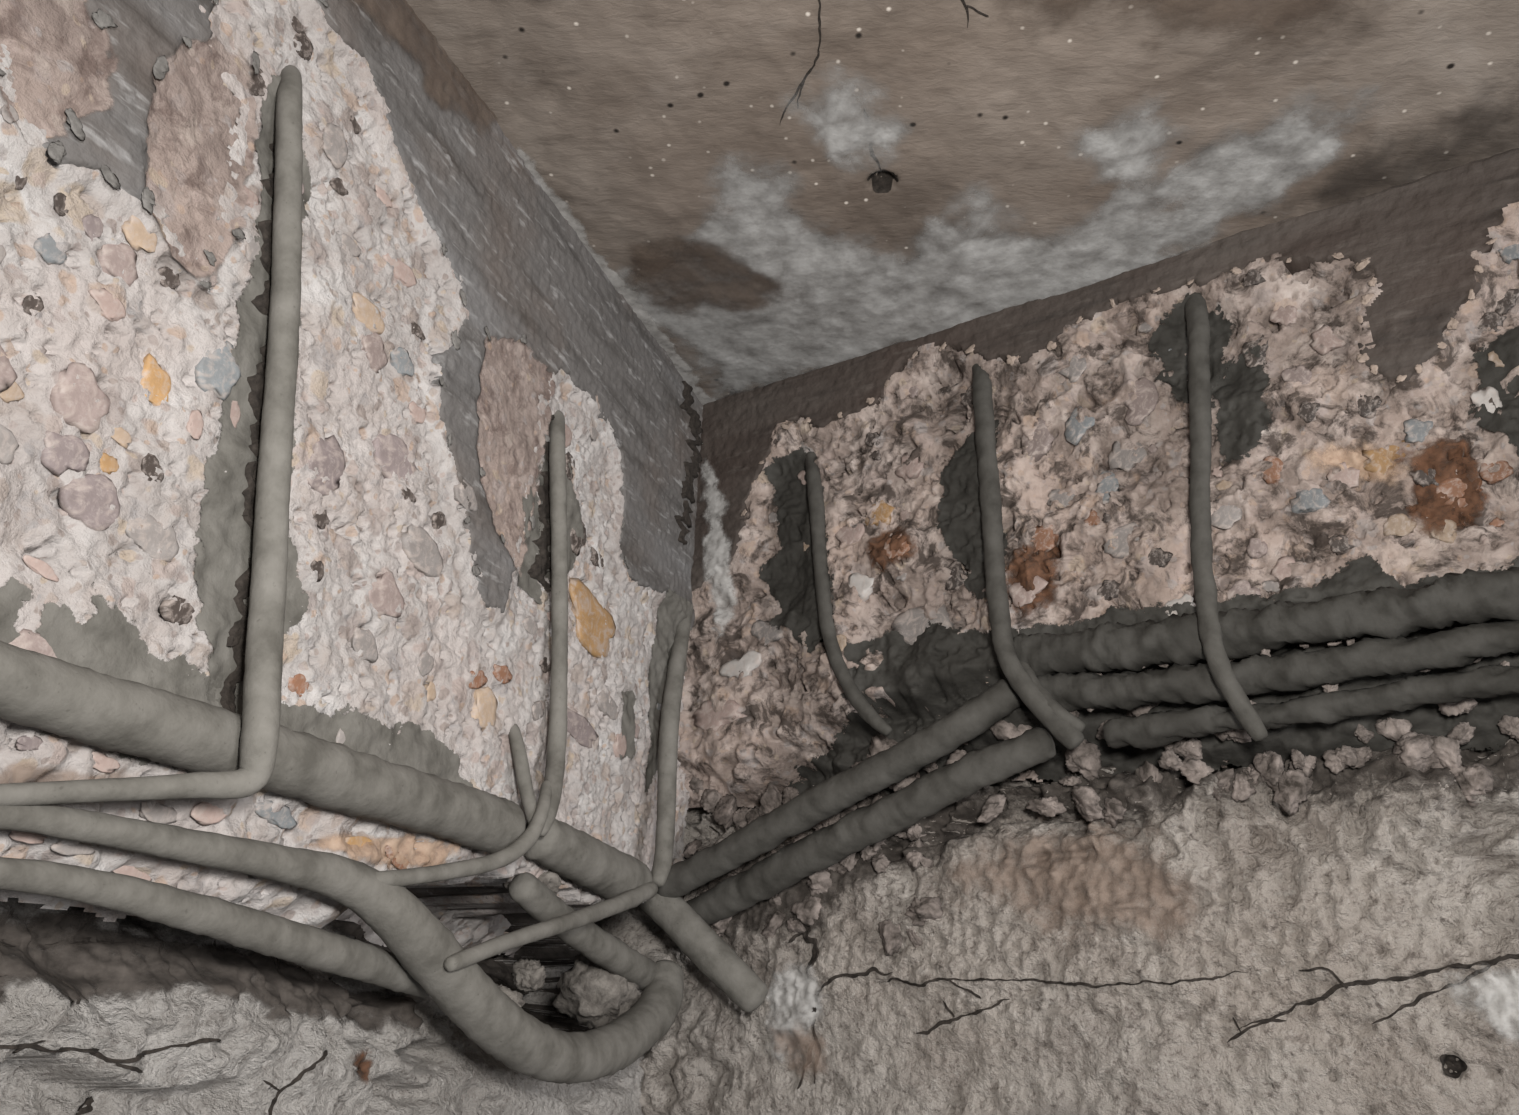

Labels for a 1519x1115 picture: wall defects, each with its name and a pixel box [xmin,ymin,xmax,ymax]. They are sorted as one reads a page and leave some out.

crack [961,0,989,28]
crack [780,0,821,123]
leakage [808,84,906,163]
leakage [518,106,1350,405]
rust [1309,439,1488,533]
spalling [0,0,684,1085]
spalling [630,202,1519,1013]
crack [0,922,149,1004]
crack [788,920,1247,1089]
crack [1228,954,1519,1042]
crack [0,1038,223,1073]
crack [263,1050,328,1115]